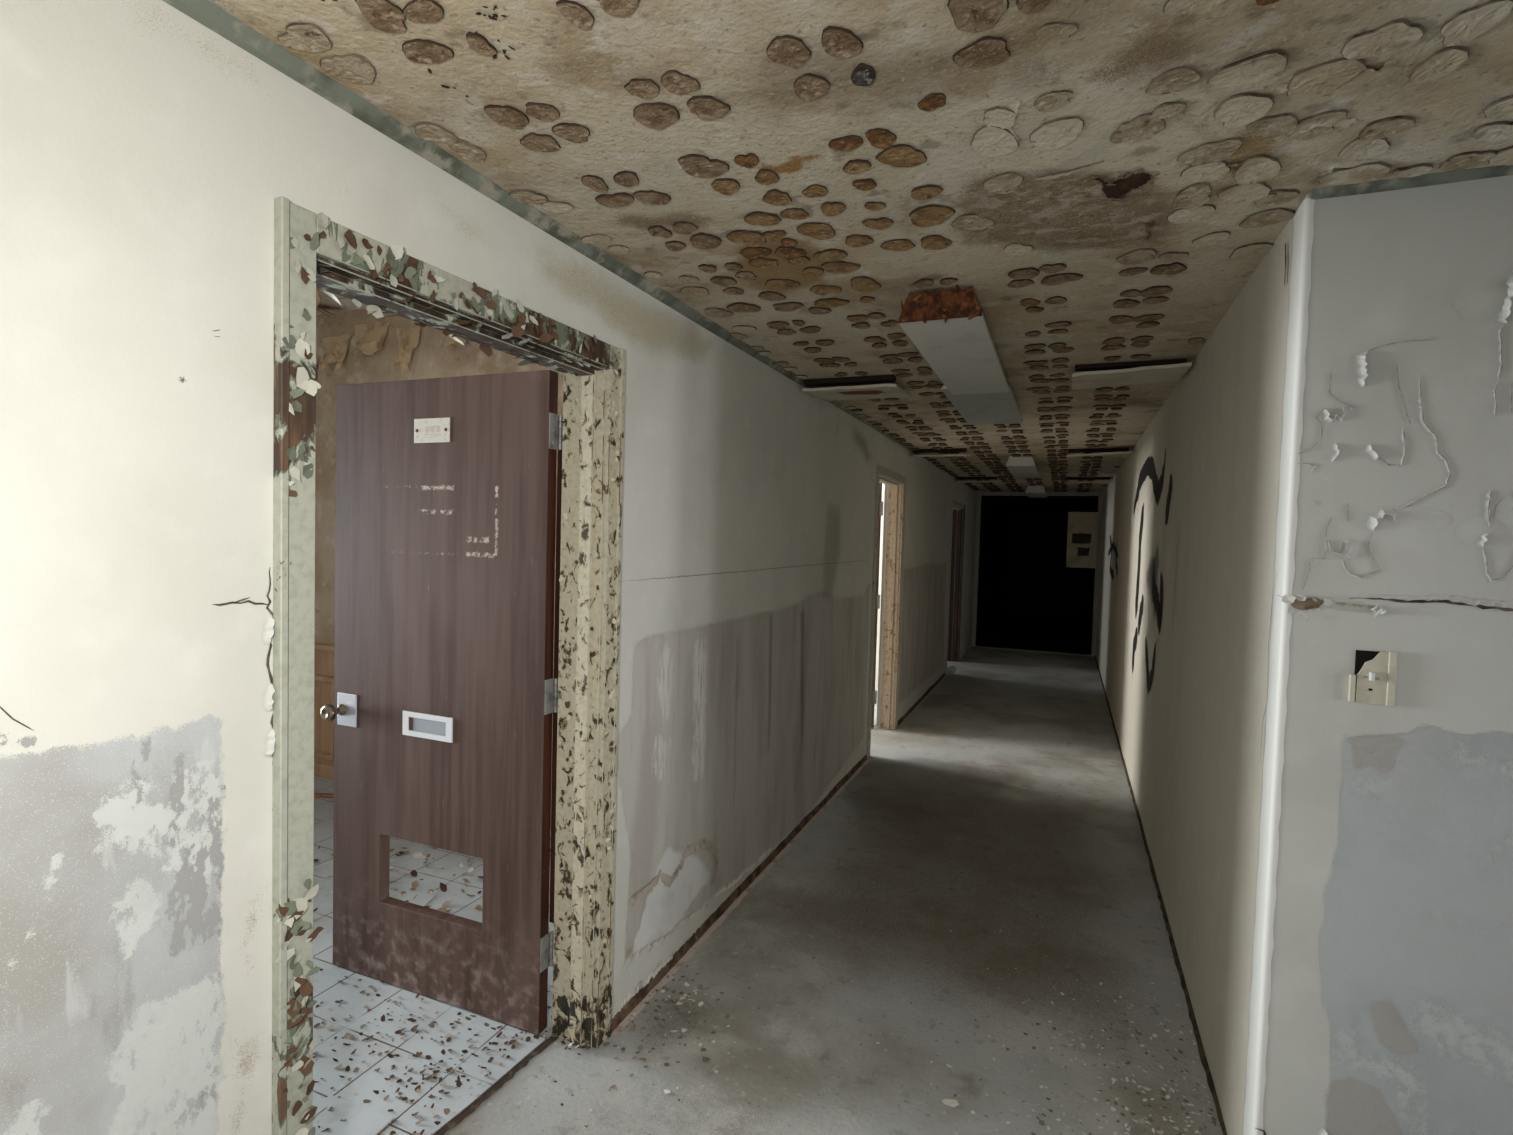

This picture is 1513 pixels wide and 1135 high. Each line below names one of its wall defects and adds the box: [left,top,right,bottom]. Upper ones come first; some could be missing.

peeling [1357,337,1433,387]
peeling [1492,269,1513,416]
peeling [1282,364,1452,621]
peeling [1477,490,1513,582]
peeling [591,544,620,642]
crack [1349,594,1513,612]
crack [212,569,276,764]
peeling [589,689,616,763]
peeling [561,790,616,902]
peeling [533,1027,590,1056]